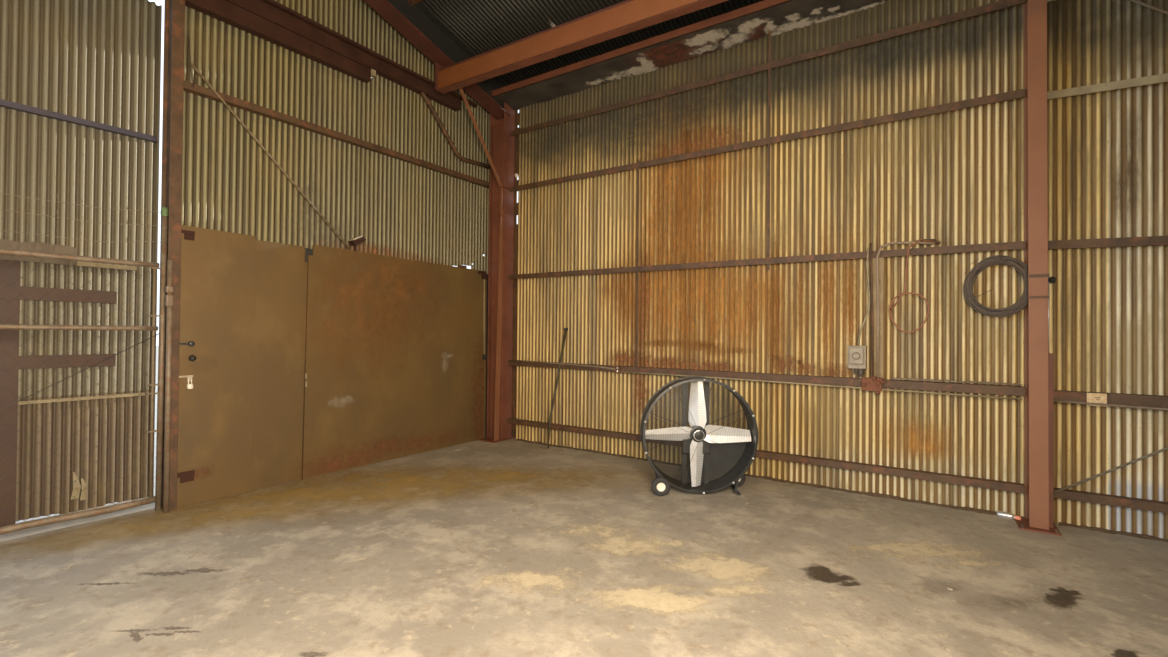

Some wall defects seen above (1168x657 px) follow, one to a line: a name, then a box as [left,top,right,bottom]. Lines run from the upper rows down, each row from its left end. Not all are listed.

peeling [684,1,884,55]
peeling [586,54,658,85]